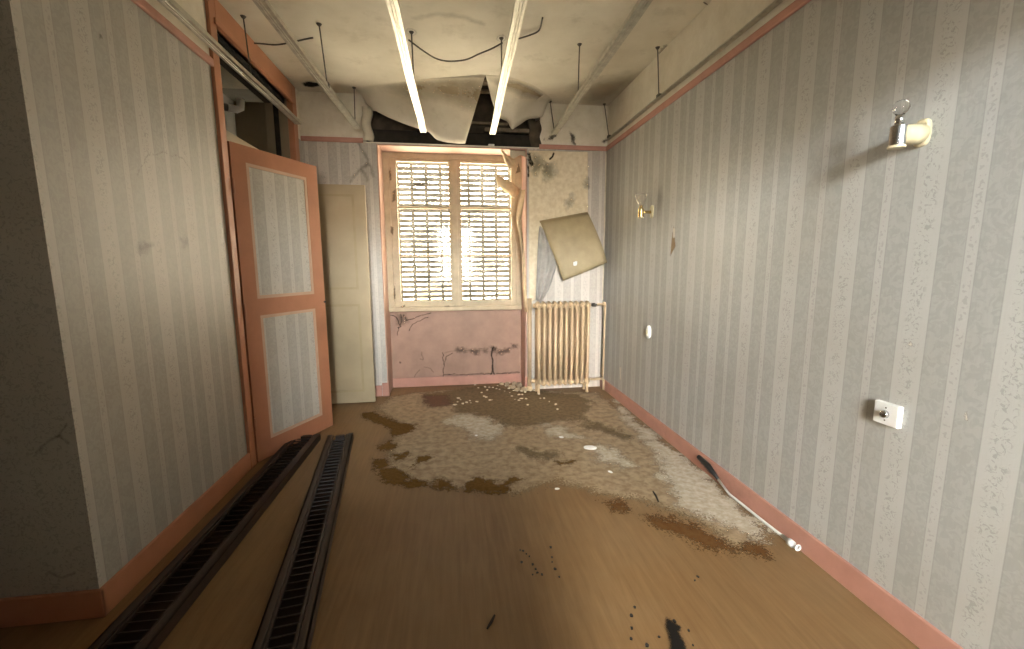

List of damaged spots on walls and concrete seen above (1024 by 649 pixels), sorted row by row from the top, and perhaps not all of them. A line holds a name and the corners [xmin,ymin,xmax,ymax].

flaking render [361,106,374,142]
water stain [527,153,551,177]
crack [442,347,511,375]